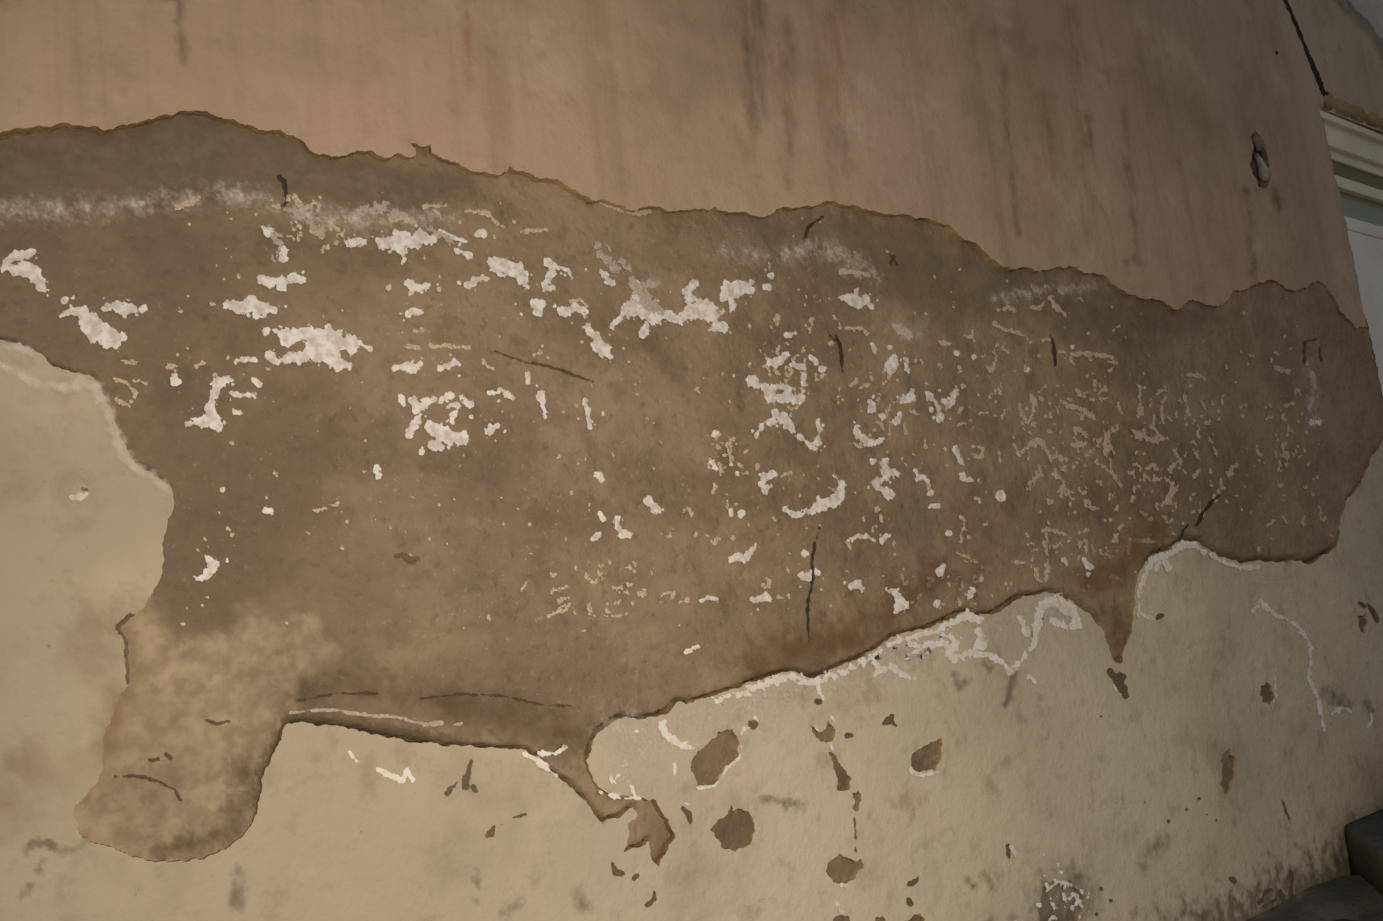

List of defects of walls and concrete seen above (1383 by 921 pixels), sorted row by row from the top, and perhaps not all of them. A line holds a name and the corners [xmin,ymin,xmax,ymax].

crack [1284,0,1328,96]
water stain [3,344,36,357]
crack [806,526,821,642]
water stain [711,592,1083,715]
water stain [1136,540,1352,732]
water stain [522,745,568,778]
water stain [599,716,698,800]
spalling [691,716,759,790]
spalling [811,698,862,811]
spalling [908,738,943,777]
spalling [710,805,755,852]
spalling [1036,853,1099,921]